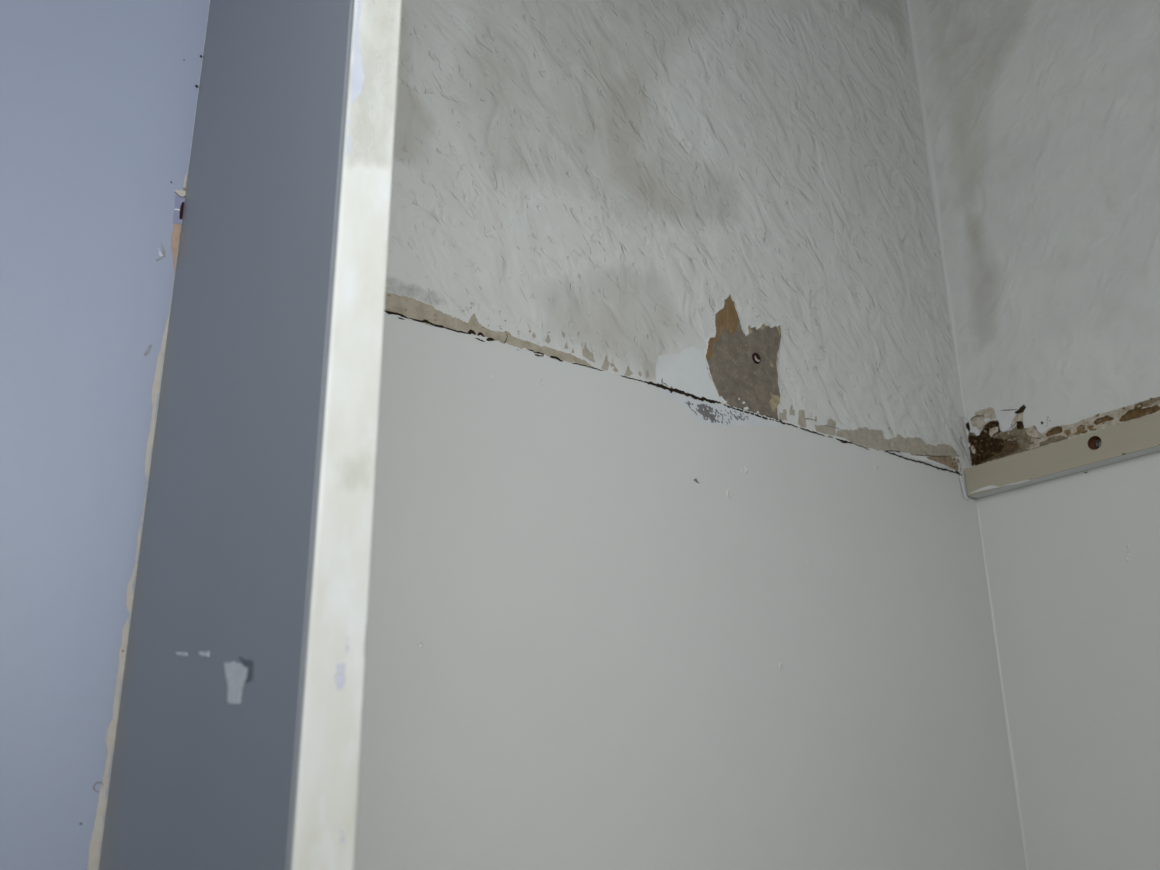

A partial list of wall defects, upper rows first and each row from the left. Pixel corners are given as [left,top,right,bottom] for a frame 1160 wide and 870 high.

flaking render [385,292,649,378]
crack [384,310,960,475]
peeling [685,293,962,476]
flaking render [1029,396,1160,449]